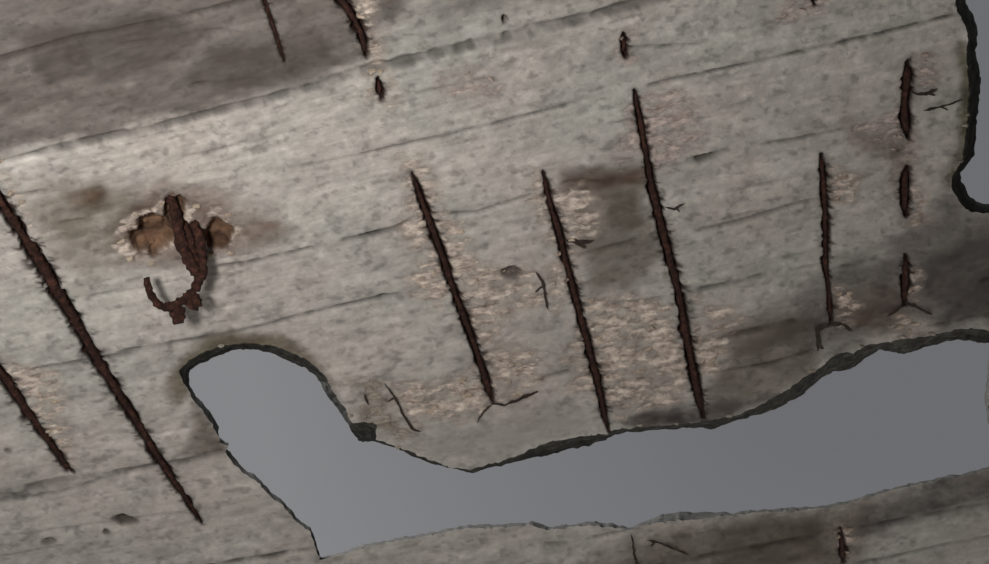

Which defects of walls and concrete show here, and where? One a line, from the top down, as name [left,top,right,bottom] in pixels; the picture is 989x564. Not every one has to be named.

spalling [951,0,989,214]
crack [665,203,685,213]
crack [564,238,594,249]
crack [887,302,932,317]
spalling [179,88,989,564]